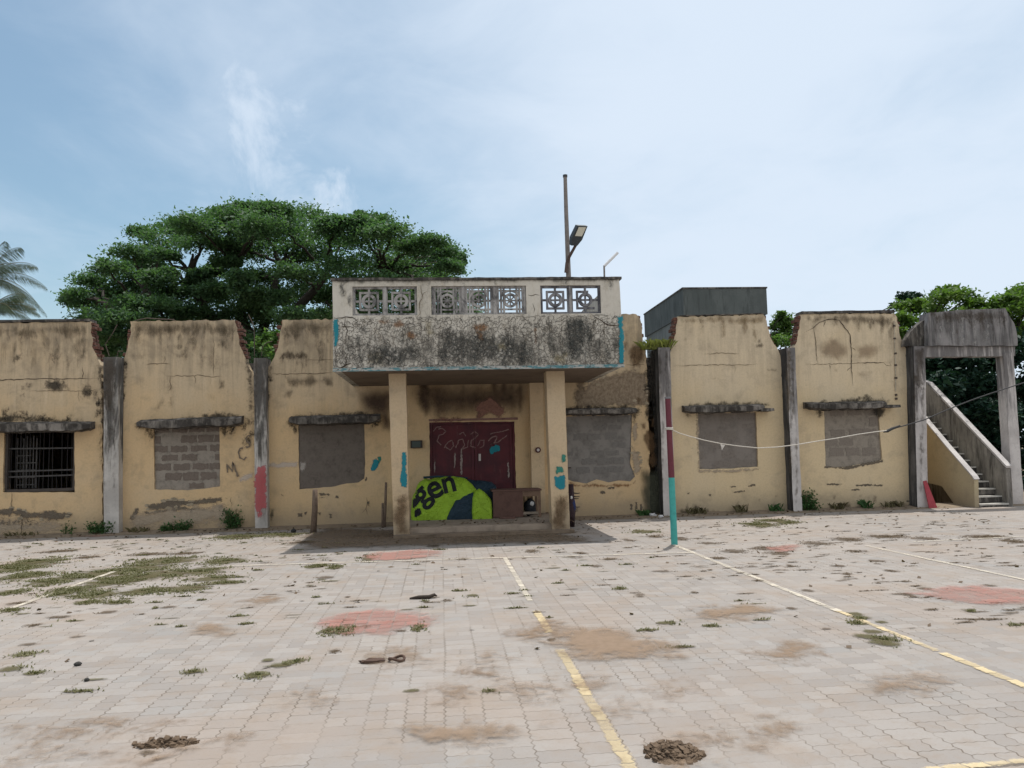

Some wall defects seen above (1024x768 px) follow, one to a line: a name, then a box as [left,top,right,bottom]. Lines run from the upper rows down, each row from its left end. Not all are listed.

spalling [91,322,104,362]
spalling [235,320,251,359]
water stain [369,346,419,365]
crack [274,286,644,388]
water stain [440,329,531,366]
water stain [566,319,600,360]
crack [806,319,891,383]
peeling [575,371,649,408]
mould [0,410,69,422]
spalling [643,421,656,467]